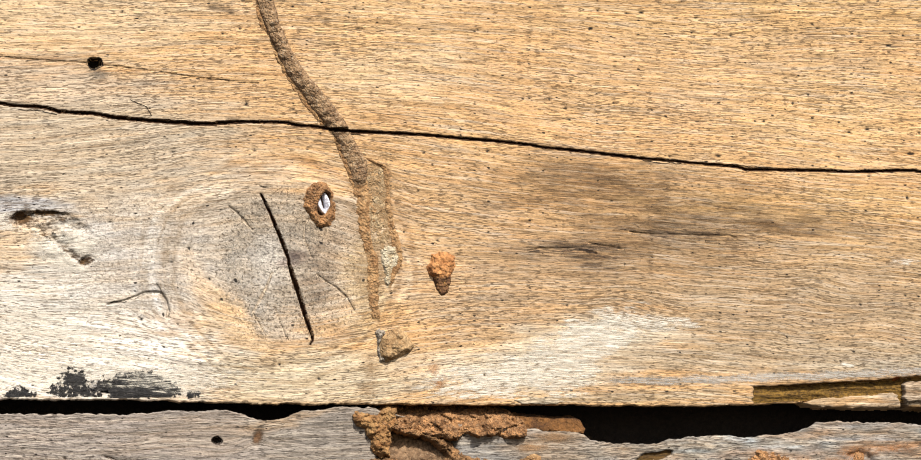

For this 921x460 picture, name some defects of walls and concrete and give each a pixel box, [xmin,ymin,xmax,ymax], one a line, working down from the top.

crack [0,100,921,173]
crack [253,186,354,345]
leakage [0,307,231,399]
spalling [752,376,921,403]